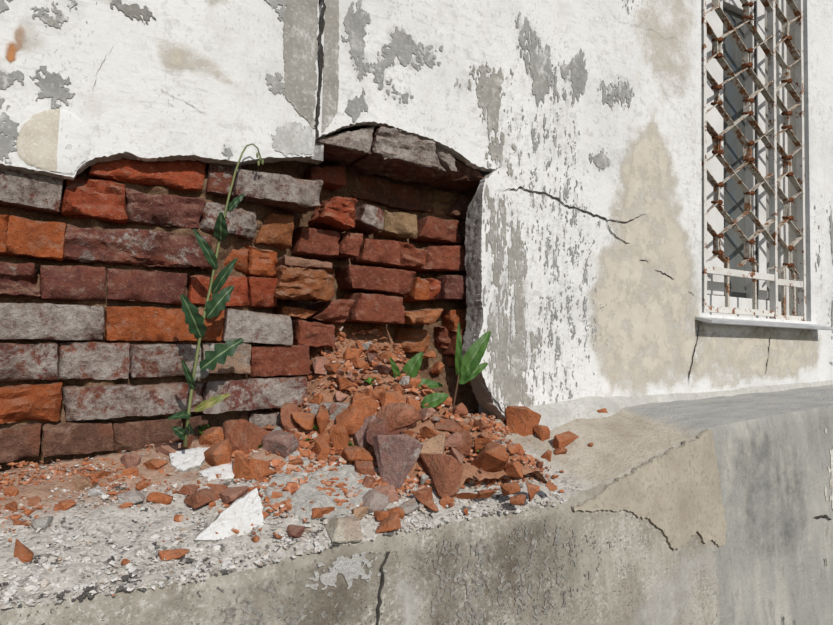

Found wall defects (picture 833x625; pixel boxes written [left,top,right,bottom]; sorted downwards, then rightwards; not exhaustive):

crack [314,0,326,137]
peeling [598,77,635,110]
crack [503,186,643,243]
leakage [590,122,818,394]
peeling [825,447,833,509]
flaking render [337,429,727,625]
crack [376,551,390,625]